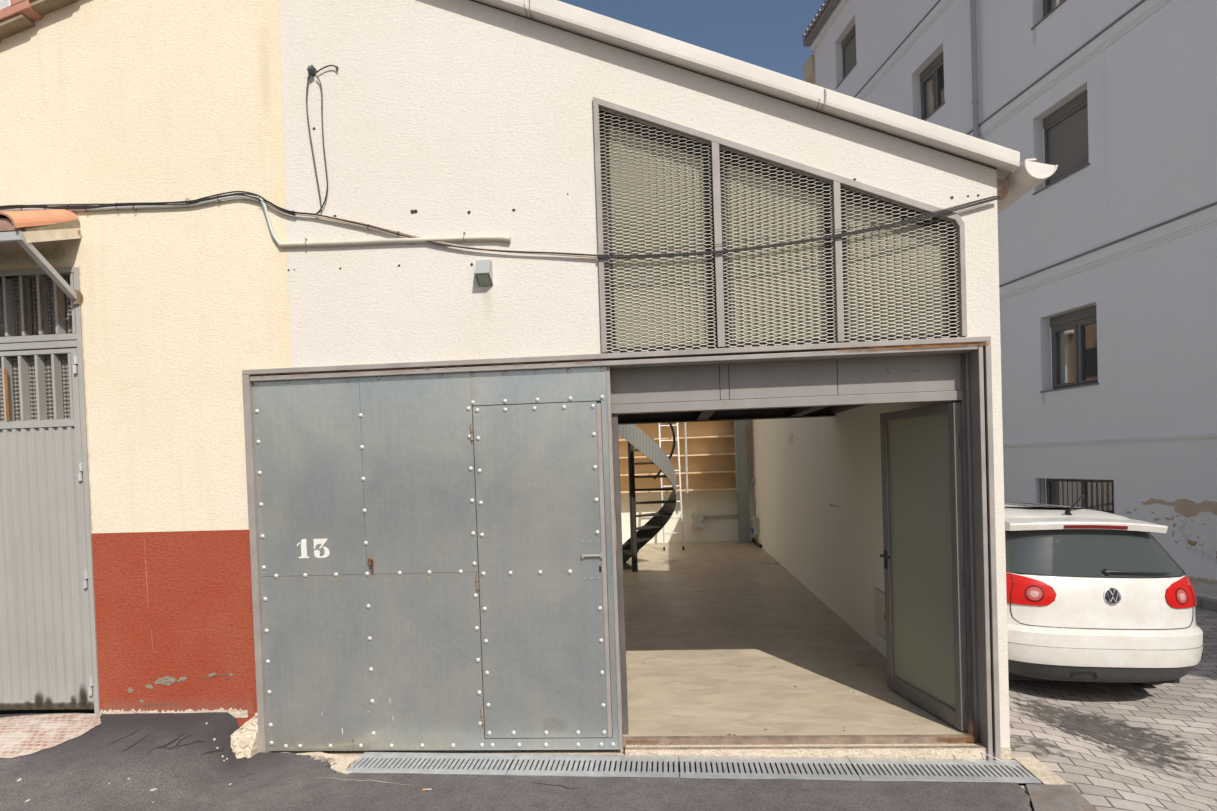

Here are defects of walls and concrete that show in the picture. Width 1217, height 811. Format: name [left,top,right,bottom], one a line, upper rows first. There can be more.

peeling [1126,497,1217,559]
spalling [100,672,259,761]